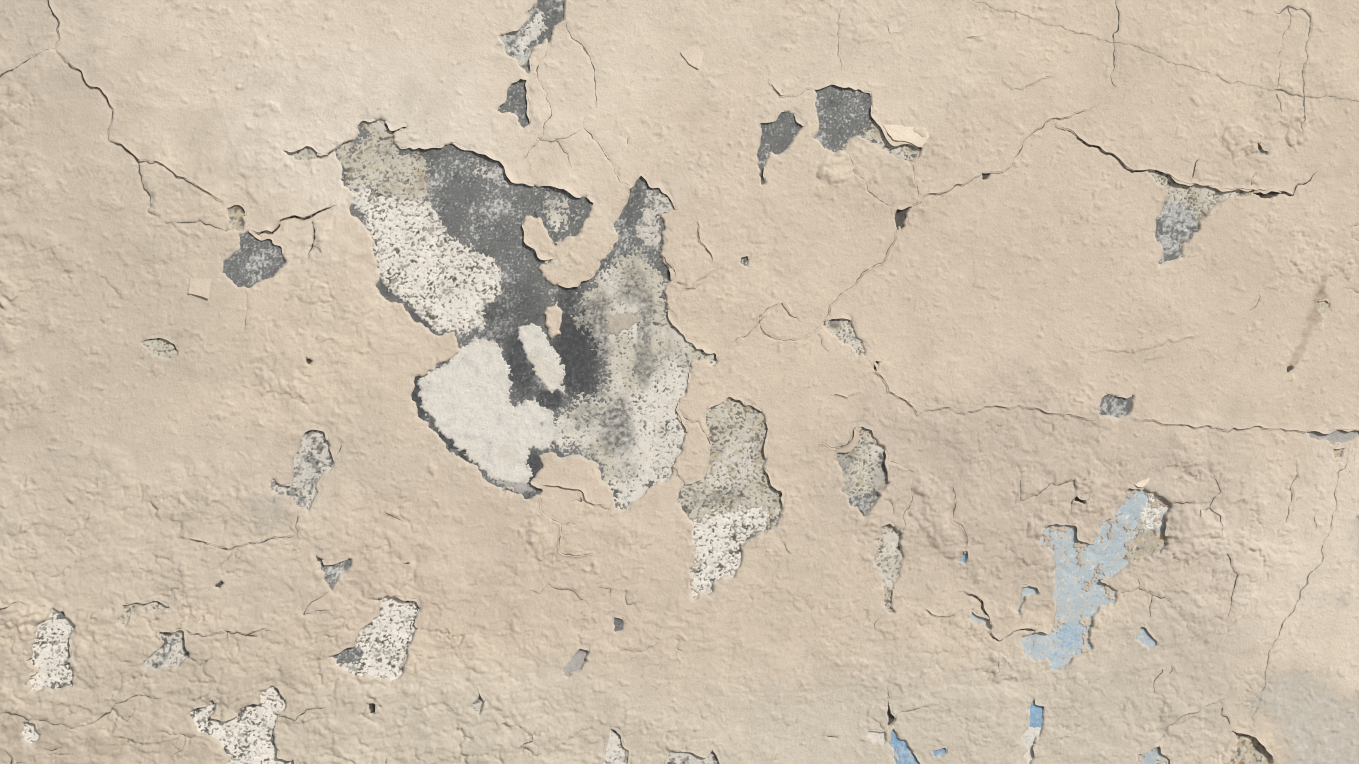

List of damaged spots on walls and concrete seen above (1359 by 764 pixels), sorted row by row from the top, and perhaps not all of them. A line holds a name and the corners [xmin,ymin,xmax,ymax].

crack [0,0,224,229]
crack [317,140,351,156]
peeling [496,0,564,128]
peeling [757,80,930,185]
crack [734,3,1356,346]
spalling [1147,167,1281,264]
peeling [188,116,785,598]
spalling [818,420,890,517]
peeling [961,478,1170,670]
spalling [24,609,75,691]
spalling [329,595,420,681]
spalling [188,685,299,764]